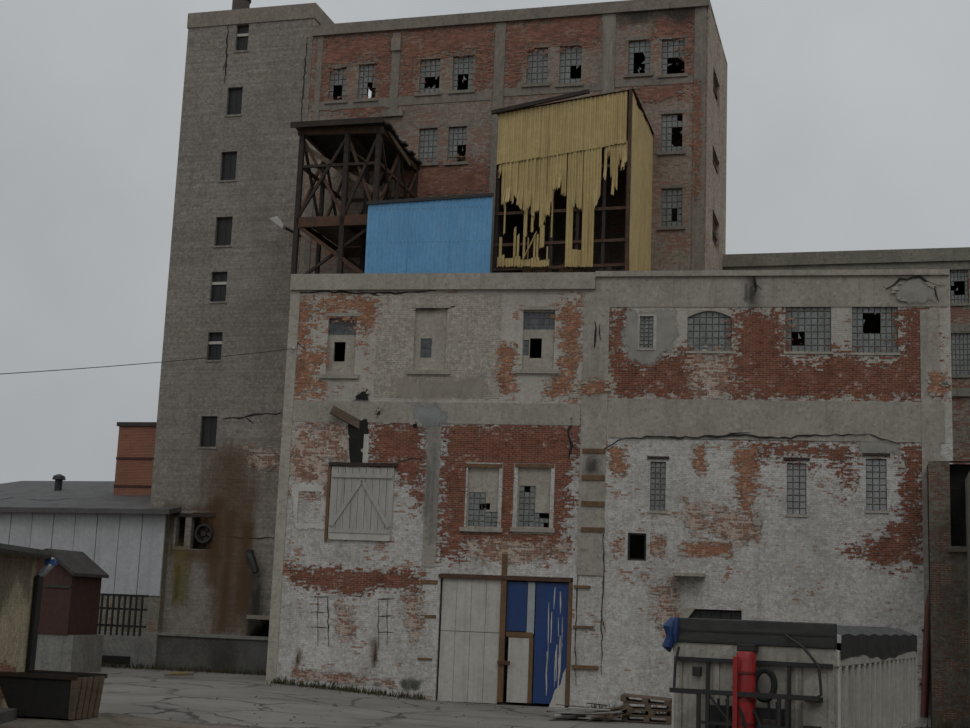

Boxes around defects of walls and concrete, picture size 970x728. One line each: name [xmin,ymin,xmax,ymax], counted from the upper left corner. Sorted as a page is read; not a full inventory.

crack [221,27,229,83]
crack [300,37,308,121]
spalling [280,290,390,401]
spalling [541,278,952,403]
crack [223,413,280,423]
spalling [237,388,427,515]
spalling [435,415,581,571]
crack [567,418,577,460]
crack [604,432,901,449]
spalling [650,439,864,560]
spalling [838,442,923,579]
spalling [283,556,426,650]